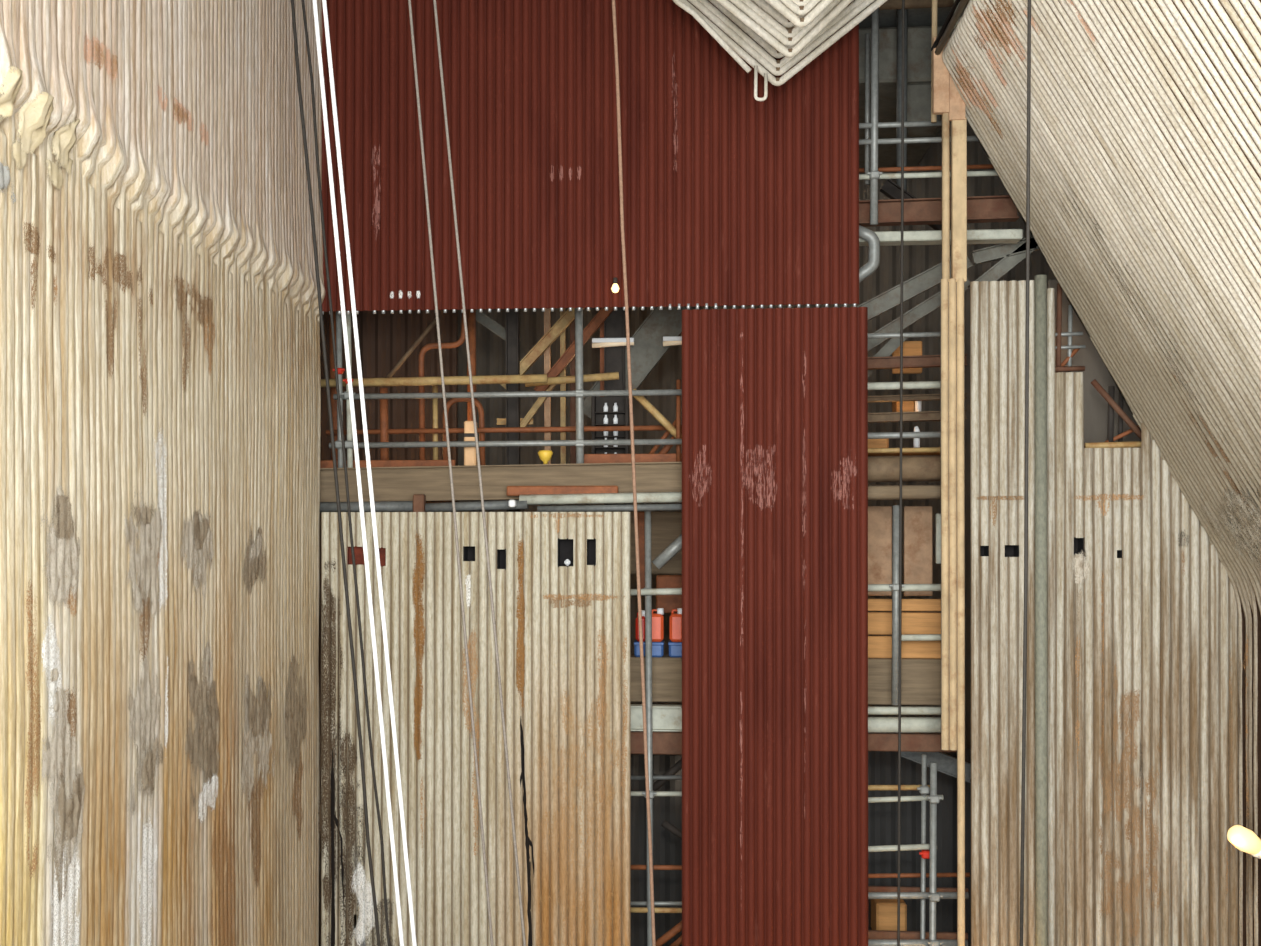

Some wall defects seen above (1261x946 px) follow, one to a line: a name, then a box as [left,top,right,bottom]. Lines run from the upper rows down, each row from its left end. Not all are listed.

corrosion [949,0,1041,139]
corrosion [1058,0,1096,43]
leakage [333,715,377,946]
corrosion [460,626,481,855]
corrosion [536,625,629,946]